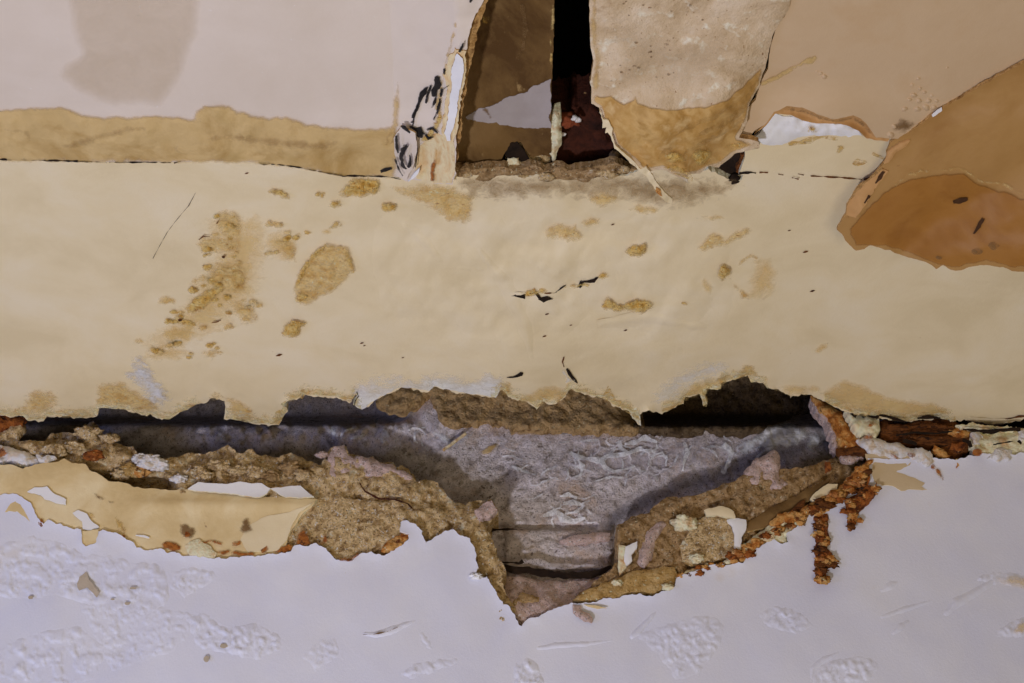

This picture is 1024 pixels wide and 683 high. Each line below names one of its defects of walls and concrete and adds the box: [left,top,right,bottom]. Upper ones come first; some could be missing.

damp [0,69,448,177]
flaking render [455,102,637,183]
peeling [754,60,1024,272]
flaking render [0,412,941,626]
flaking render [354,375,811,439]
corrosion [677,395,882,585]
flaking render [955,422,1024,463]